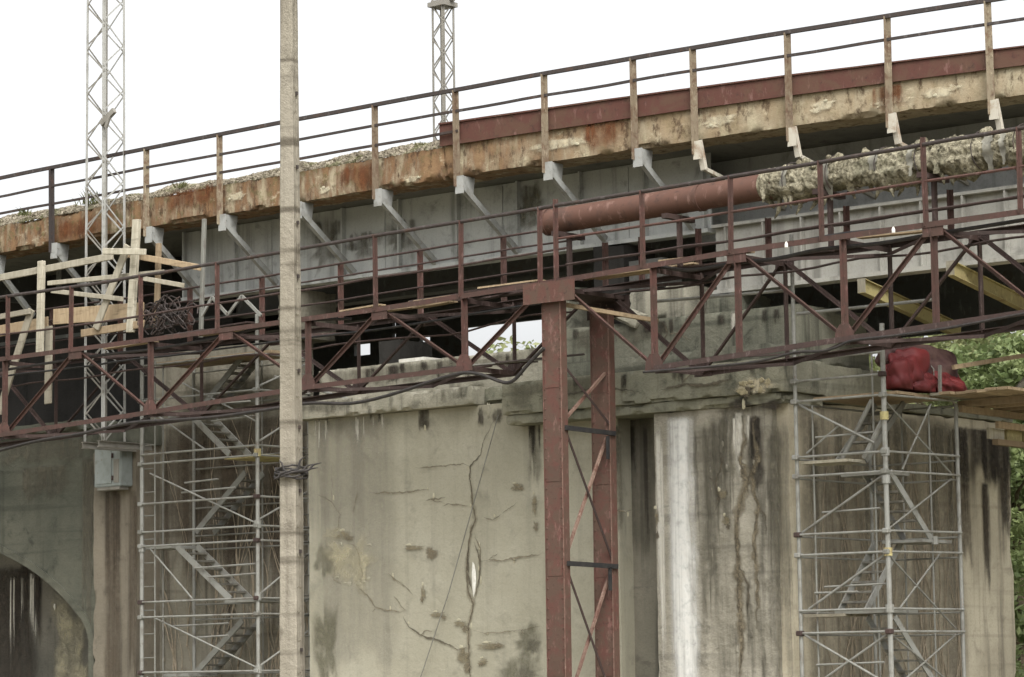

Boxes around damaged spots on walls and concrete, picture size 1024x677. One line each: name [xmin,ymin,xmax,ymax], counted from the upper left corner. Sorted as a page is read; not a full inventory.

spalling [729,377,781,410]
leakage [0,567,40,677]
crack [296,438,535,673]
leakage [505,626,536,677]
leakage [620,413,790,677]
leakage [802,411,1011,677]